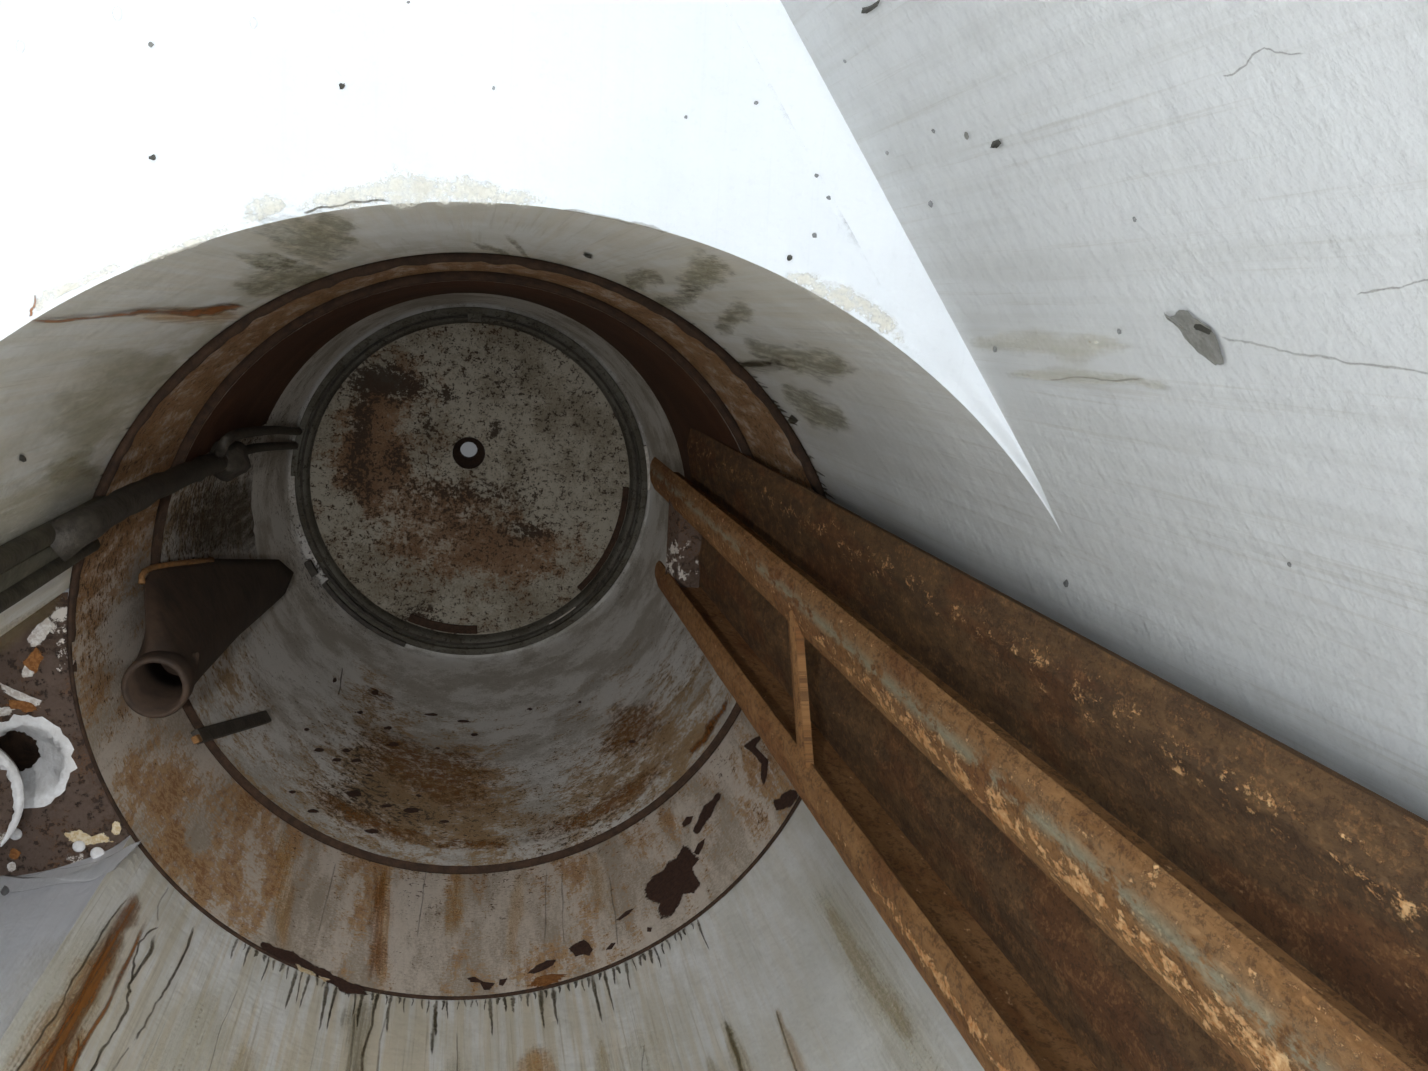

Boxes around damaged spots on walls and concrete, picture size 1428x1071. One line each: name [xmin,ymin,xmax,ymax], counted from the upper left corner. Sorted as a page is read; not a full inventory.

rust [34,304,241,323]
water stain [662,306,834,499]
rust [318,788,503,849]
rust [360,730,494,811]
rust [527,759,667,841]
rust [598,702,663,755]
rust [690,701,727,753]
peeling [744,736,768,784]
peeling [773,789,798,810]
crack [16,905,121,1071]
rust [32,898,142,1071]
crack [90,928,193,1071]